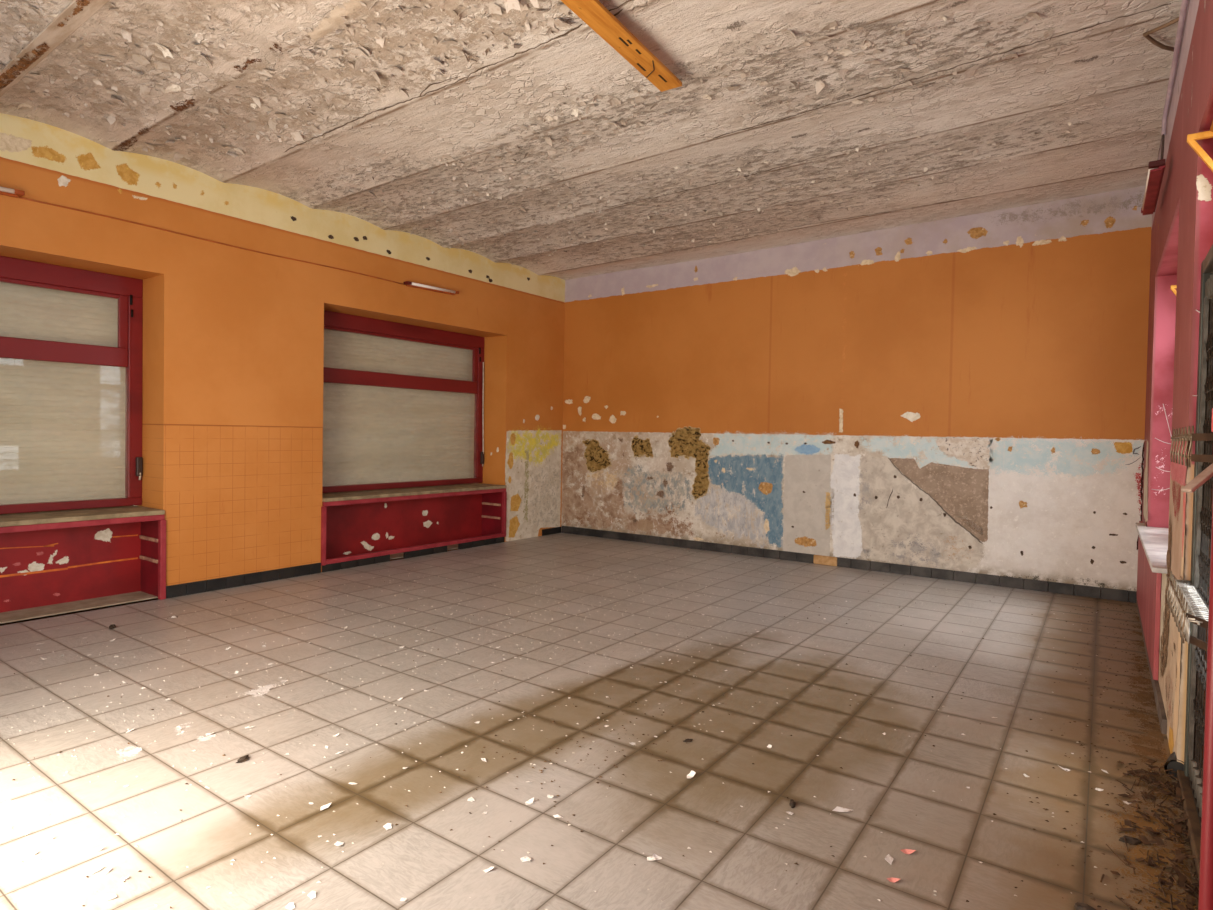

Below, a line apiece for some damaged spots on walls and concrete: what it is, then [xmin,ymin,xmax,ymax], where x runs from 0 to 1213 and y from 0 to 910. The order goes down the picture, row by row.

peeling [0,0,586,166]
peeling [0,133,140,194]
peeling [270,0,1153,268]
peeling [785,266,827,276]
peeling [0,550,69,576]
peeling [95,528,112,543]
peeling [343,532,394,555]
flaking render [490,396,626,541]
spalling [631,426,711,499]
spalling [758,482,773,495]
flaking render [858,437,1013,571]
spalling [1143,439,1187,718]